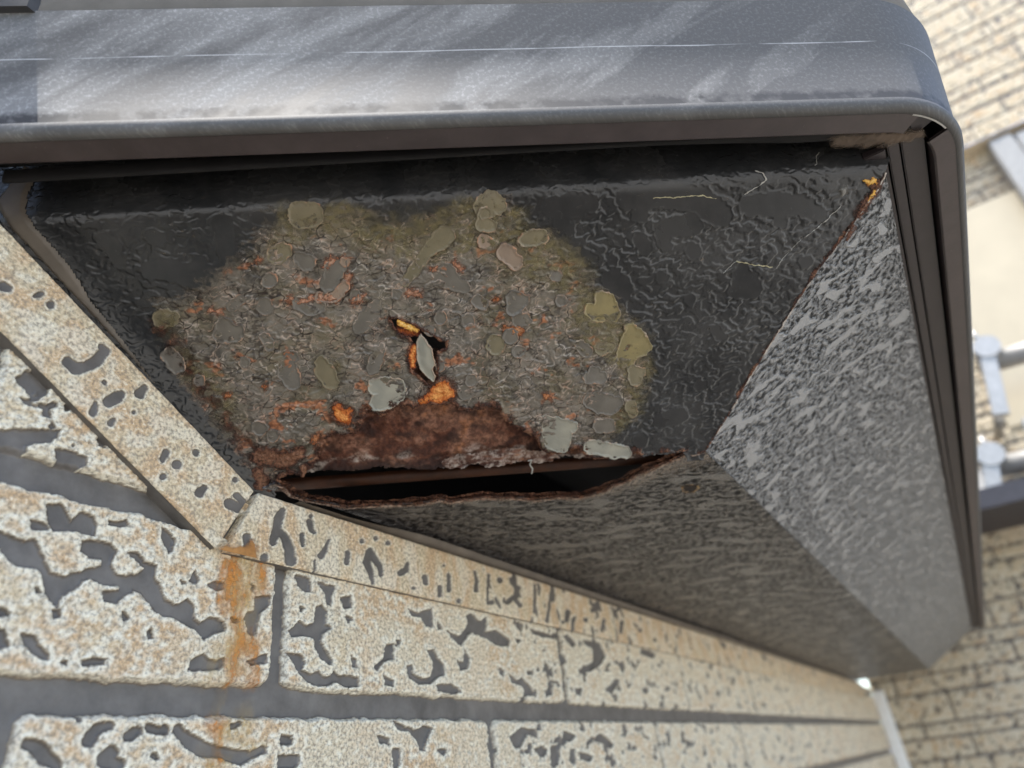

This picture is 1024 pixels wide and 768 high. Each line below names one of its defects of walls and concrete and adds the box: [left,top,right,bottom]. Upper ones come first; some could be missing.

peeling [152,189,653,492]
rust [396,319,423,370]
rust [329,401,357,428]
rust [415,375,458,406]
rust [218,540,266,686]